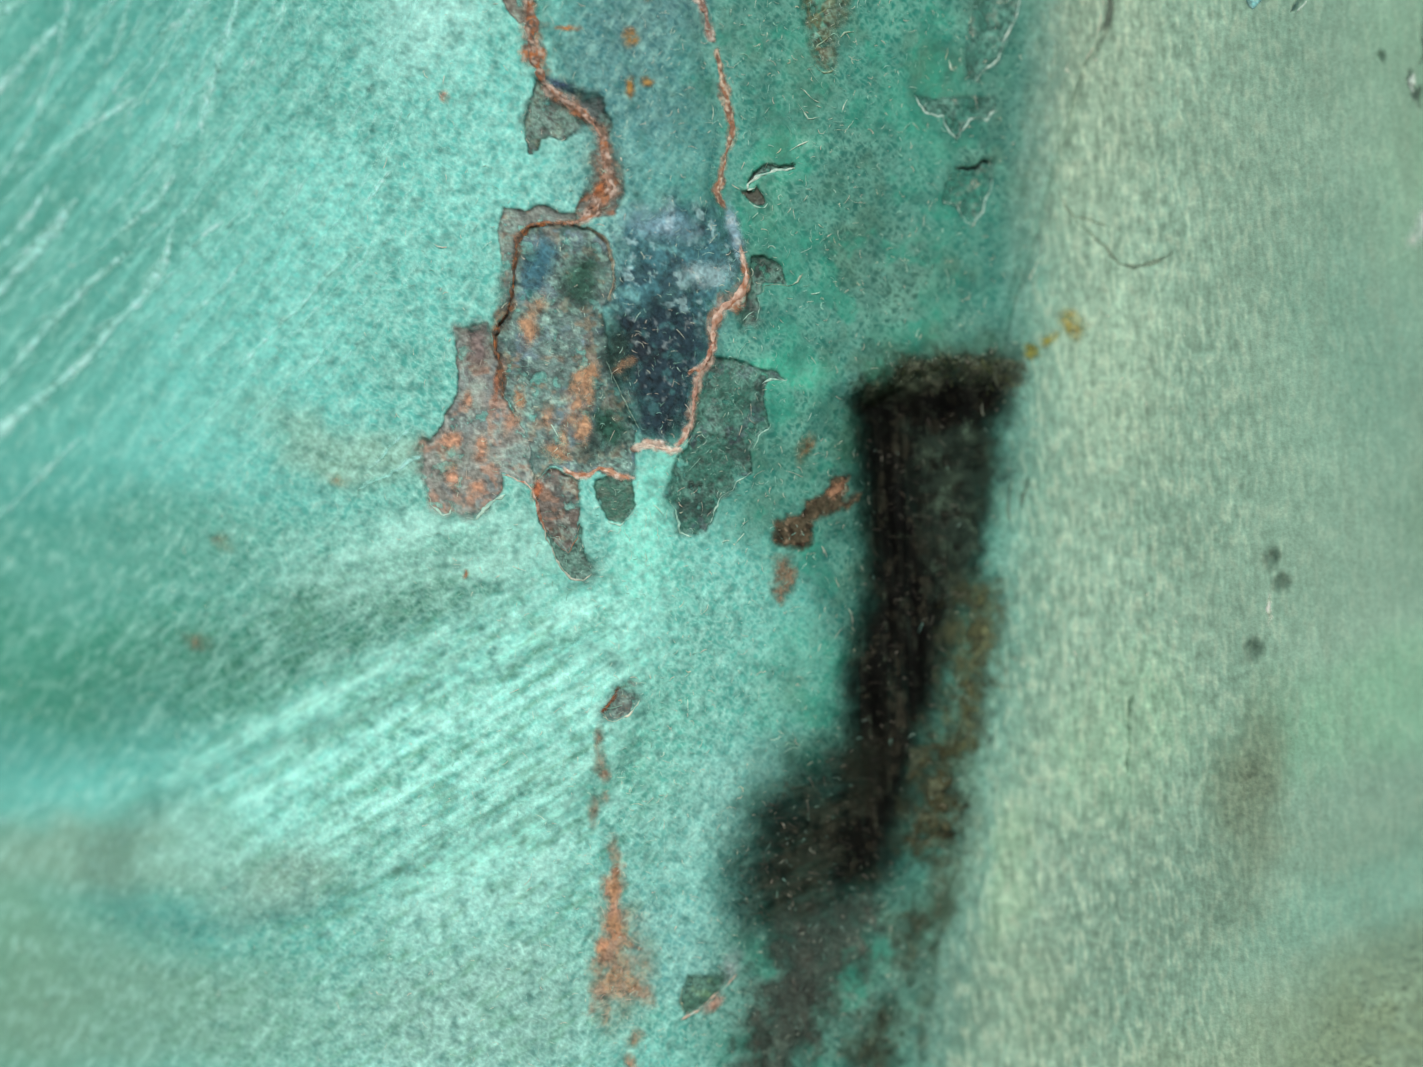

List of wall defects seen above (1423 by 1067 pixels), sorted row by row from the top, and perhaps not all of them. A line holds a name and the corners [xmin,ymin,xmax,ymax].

spalling [503,0,526,23]
peeling [904,0,1020,139]
crack [1064,0,1113,73]
peeling [927,160,993,234]
peeling [419,79,824,581]
damp [943,584,1002,759]
rust [596,732,609,779]
rust [594,848,649,998]
peeling [680,964,737,1020]
damp [732,905,882,1067]
damp [846,1007,895,1067]